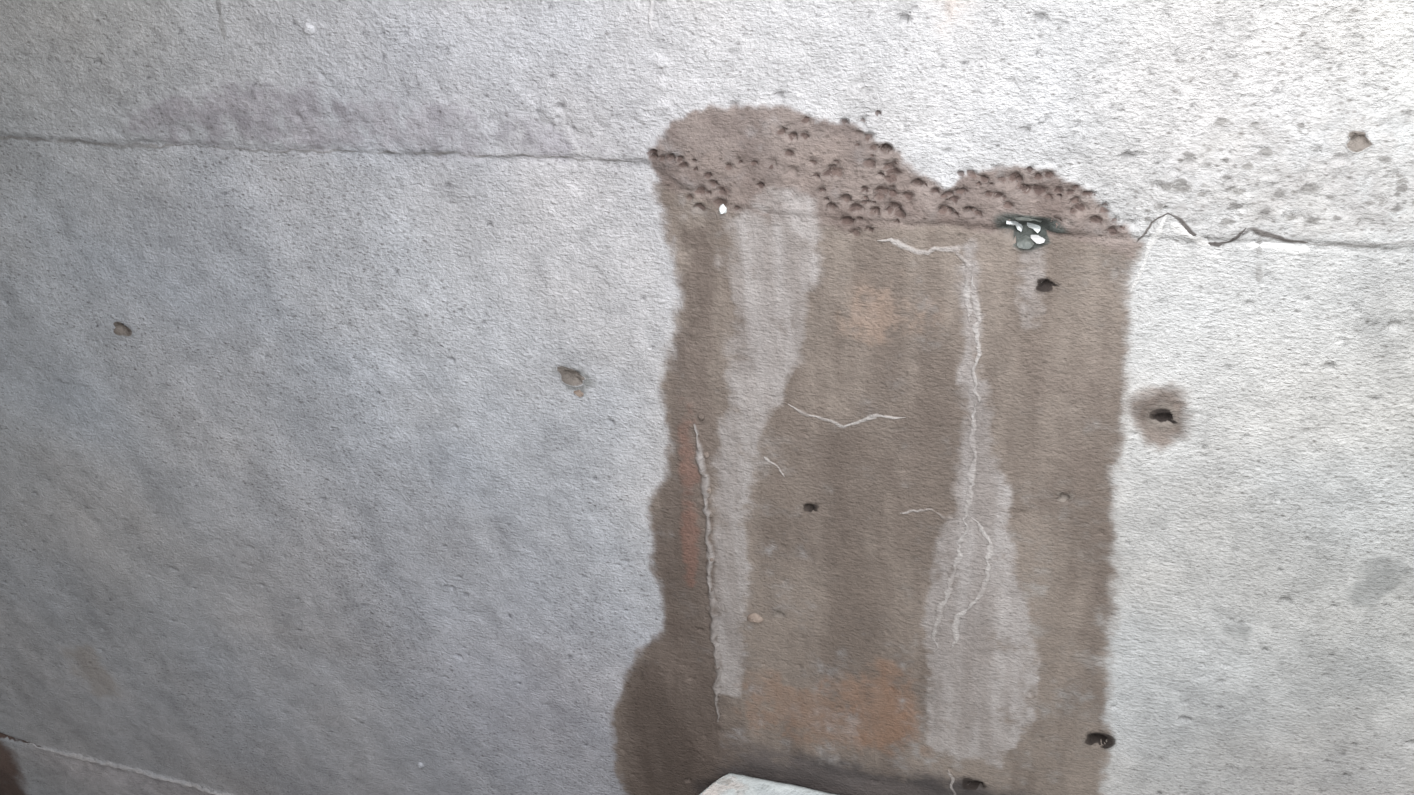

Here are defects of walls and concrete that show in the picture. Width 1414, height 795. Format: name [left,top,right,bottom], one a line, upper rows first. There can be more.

leakage [604,99,1200,795]
crack [1130,212,1414,293]